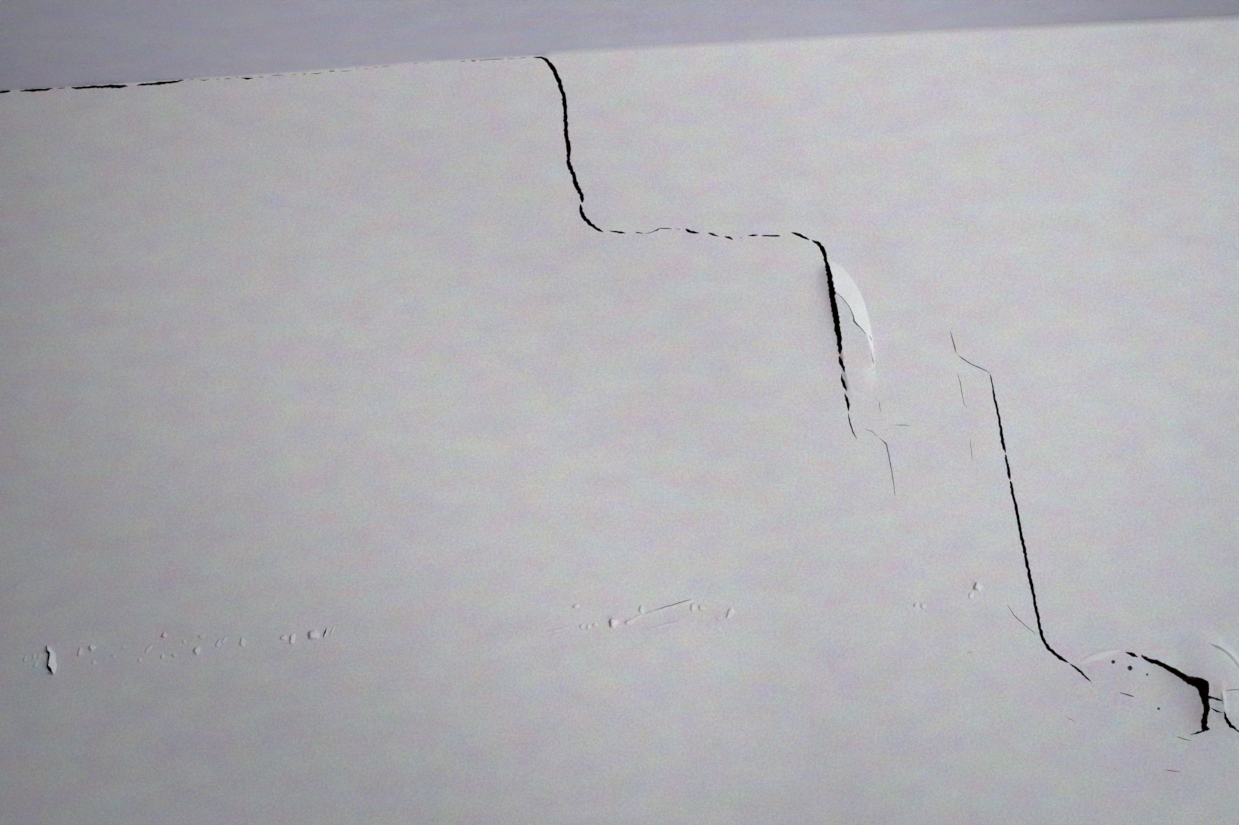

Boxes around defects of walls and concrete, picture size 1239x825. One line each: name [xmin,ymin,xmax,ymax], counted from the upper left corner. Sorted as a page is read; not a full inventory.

crack [0,66,385,93]
crack [462,56,909,493]
crack [950,332,1092,683]